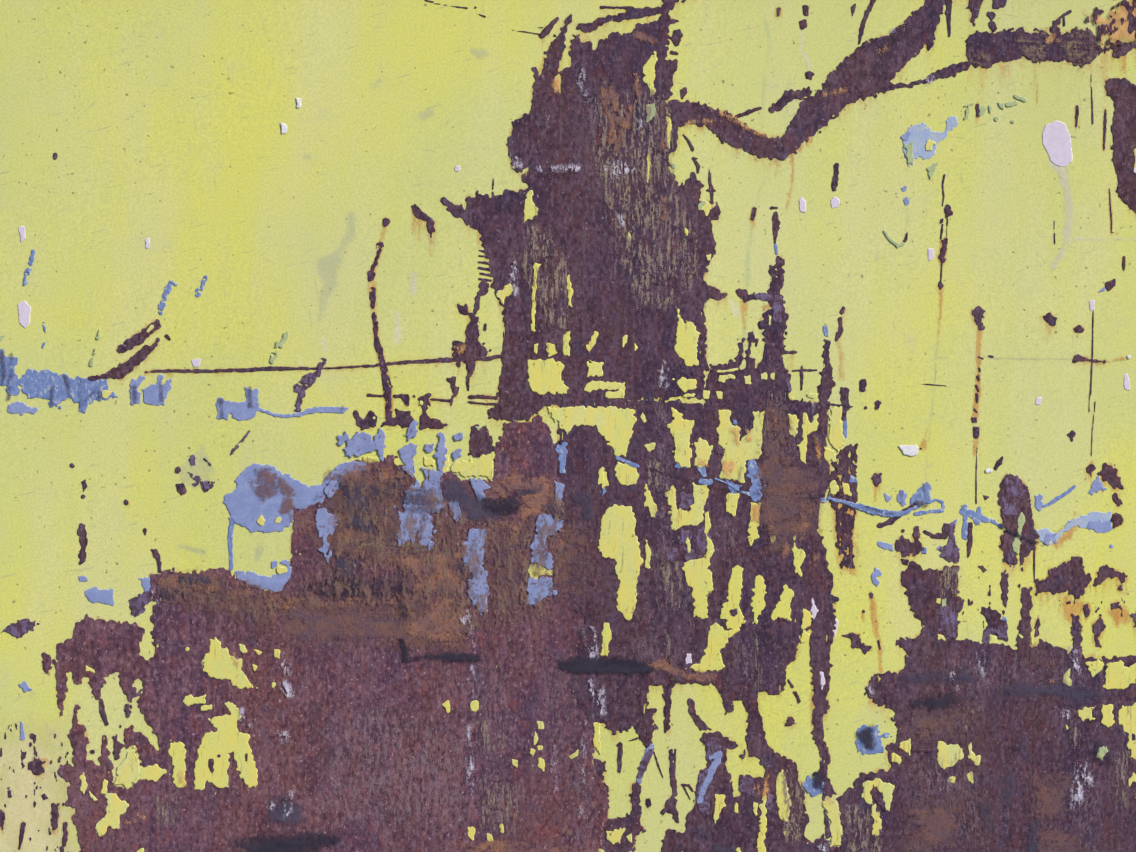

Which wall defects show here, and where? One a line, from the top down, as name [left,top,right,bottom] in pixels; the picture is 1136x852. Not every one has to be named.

corrosion [1101,76,1136,220]
corrosion [353,216,460,433]
peeling [0,349,172,415]
peeling [216,386,349,421]
corrosion [77,523,88,565]
peeling [223,420,491,615]
corrosion [997,474,1040,607]
corrosion [1084,460,1126,531]
peeling [2,618,40,638]
peeling [78,576,114,606]
peeling [129,576,161,617]
corrosion [1093,564,1128,594]